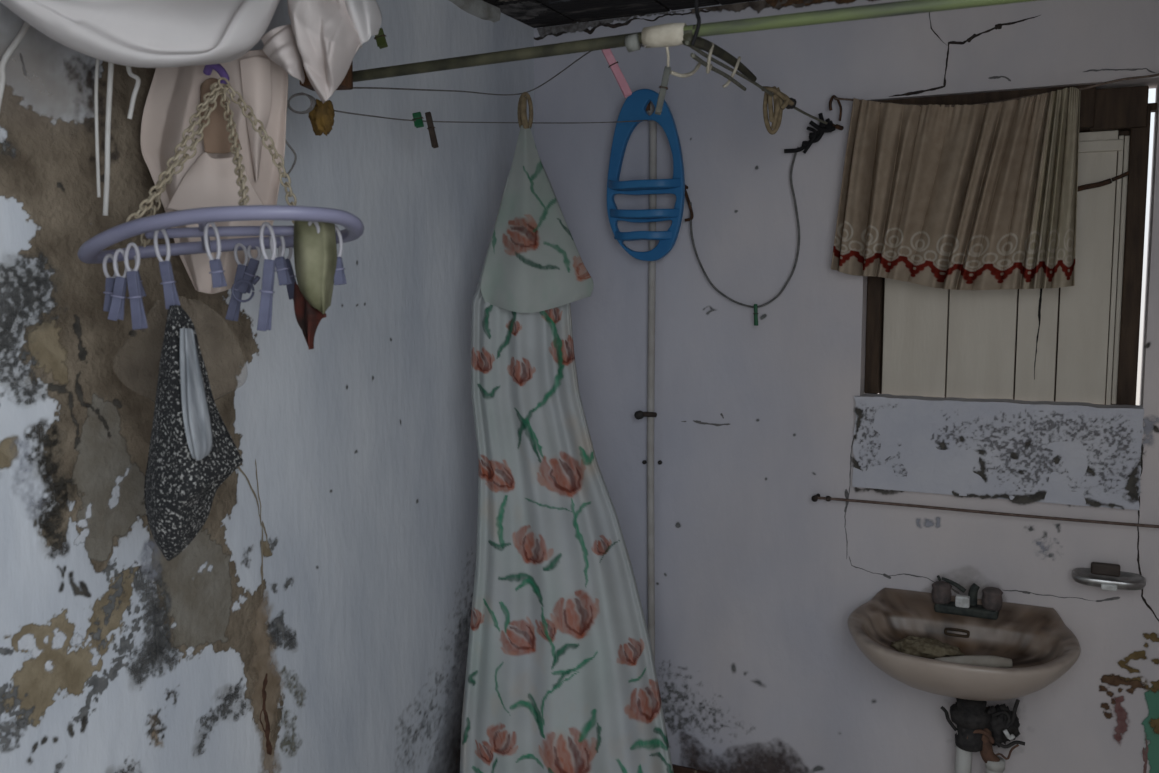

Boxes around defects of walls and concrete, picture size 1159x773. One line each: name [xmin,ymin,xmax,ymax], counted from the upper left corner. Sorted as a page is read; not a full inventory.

damp [0,47,68,105]
flaking render [483,0,876,38]
crack [889,12,1040,97]
crack [1084,66,1155,74]
damp [0,253,58,404]
flaking render [0,61,284,750]
peeling [932,411,1144,510]
crack [844,438,959,594]
crack [1003,444,1159,621]
damp [402,680,465,773]
damp [661,678,823,773]
peeling [1099,633,1159,743]